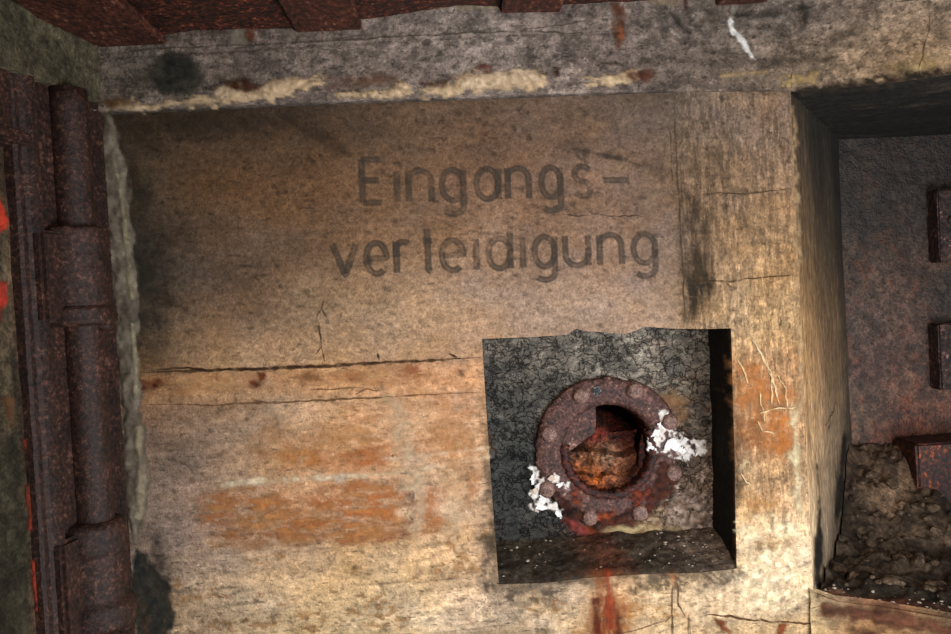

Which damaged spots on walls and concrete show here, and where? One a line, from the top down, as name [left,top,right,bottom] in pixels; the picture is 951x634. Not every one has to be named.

damp [151,52,203,94]
flaking render [106,73,326,111]
flaking render [335,64,559,100]
flaking render [583,62,653,87]
damp [686,248,711,313]
rust [737,365,794,453]
rust [554,462,679,534]
damp [603,490,711,534]
rust [591,591,628,634]